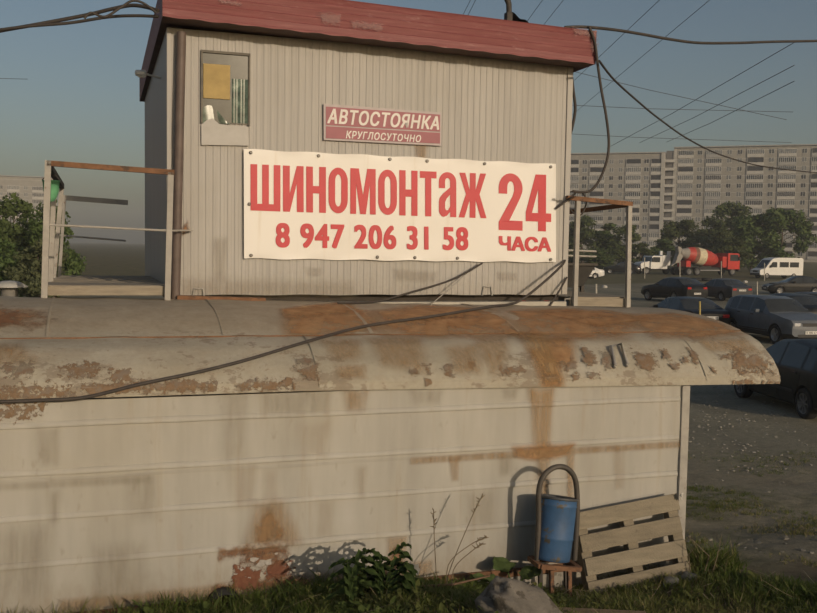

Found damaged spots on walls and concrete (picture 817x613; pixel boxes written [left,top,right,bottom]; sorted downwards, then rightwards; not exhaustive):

rust [0,309,42,327]
peeling [0,360,223,424]
peeling [236,355,322,392]
peeling [409,363,432,386]
rust [282,303,745,474]
peeling [540,344,613,383]
peeling [630,347,699,372]
peeling [718,346,780,384]
peeling [214,545,308,590]